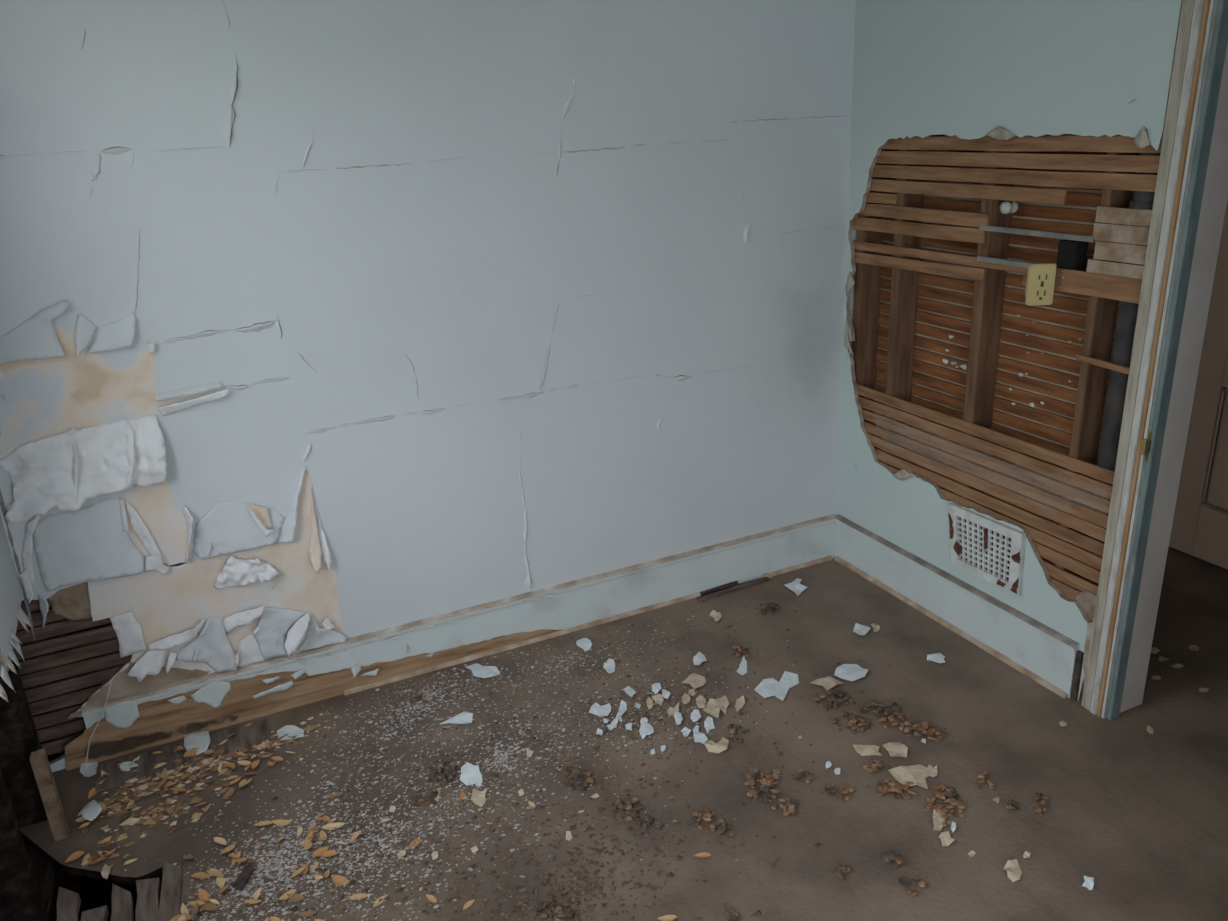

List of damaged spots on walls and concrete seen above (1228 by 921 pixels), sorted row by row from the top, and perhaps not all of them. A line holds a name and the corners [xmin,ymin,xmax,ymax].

crack [275,112,465,195]
crack [510,52,848,175]
flaking render [0,298,232,461]
crack [157,316,317,372]
crack [302,306,850,439]
flaking render [844,126,1161,689]
crack [519,430,532,592]